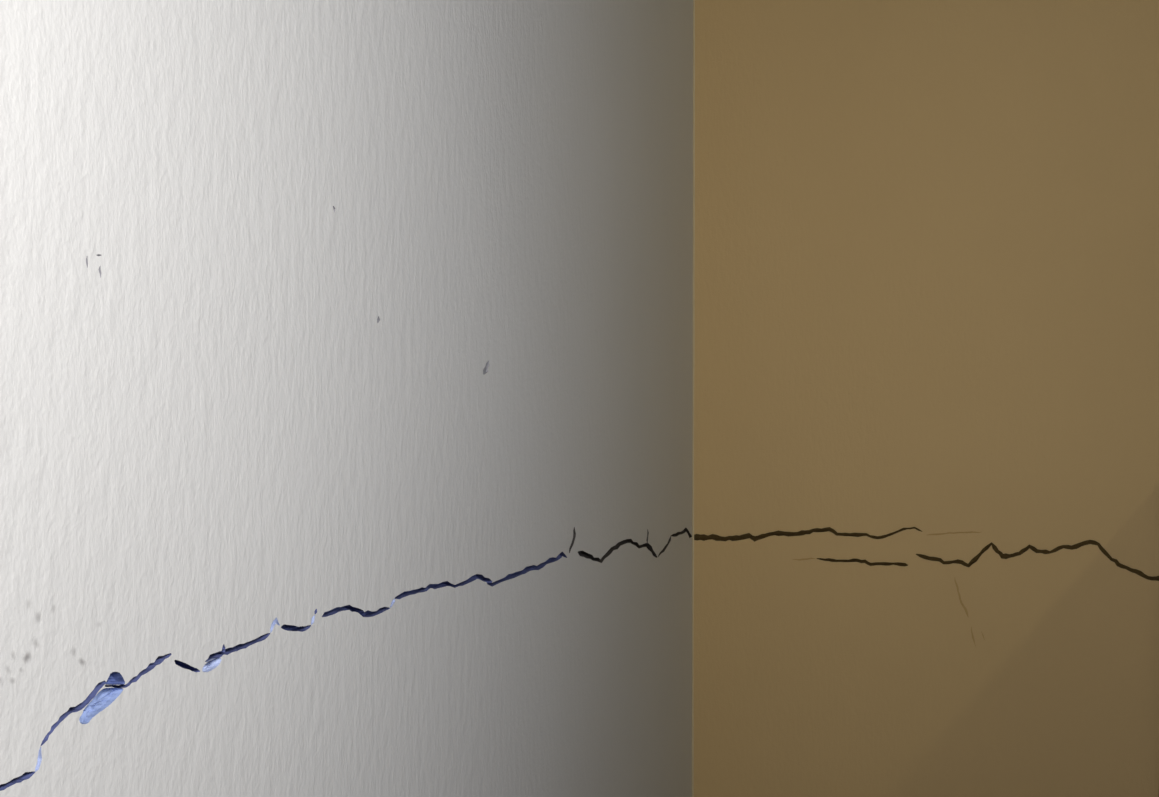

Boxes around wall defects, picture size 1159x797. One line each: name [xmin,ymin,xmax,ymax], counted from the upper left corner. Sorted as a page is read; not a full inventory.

spalling [79,672,125,724]
crack [0,527,1159,791]